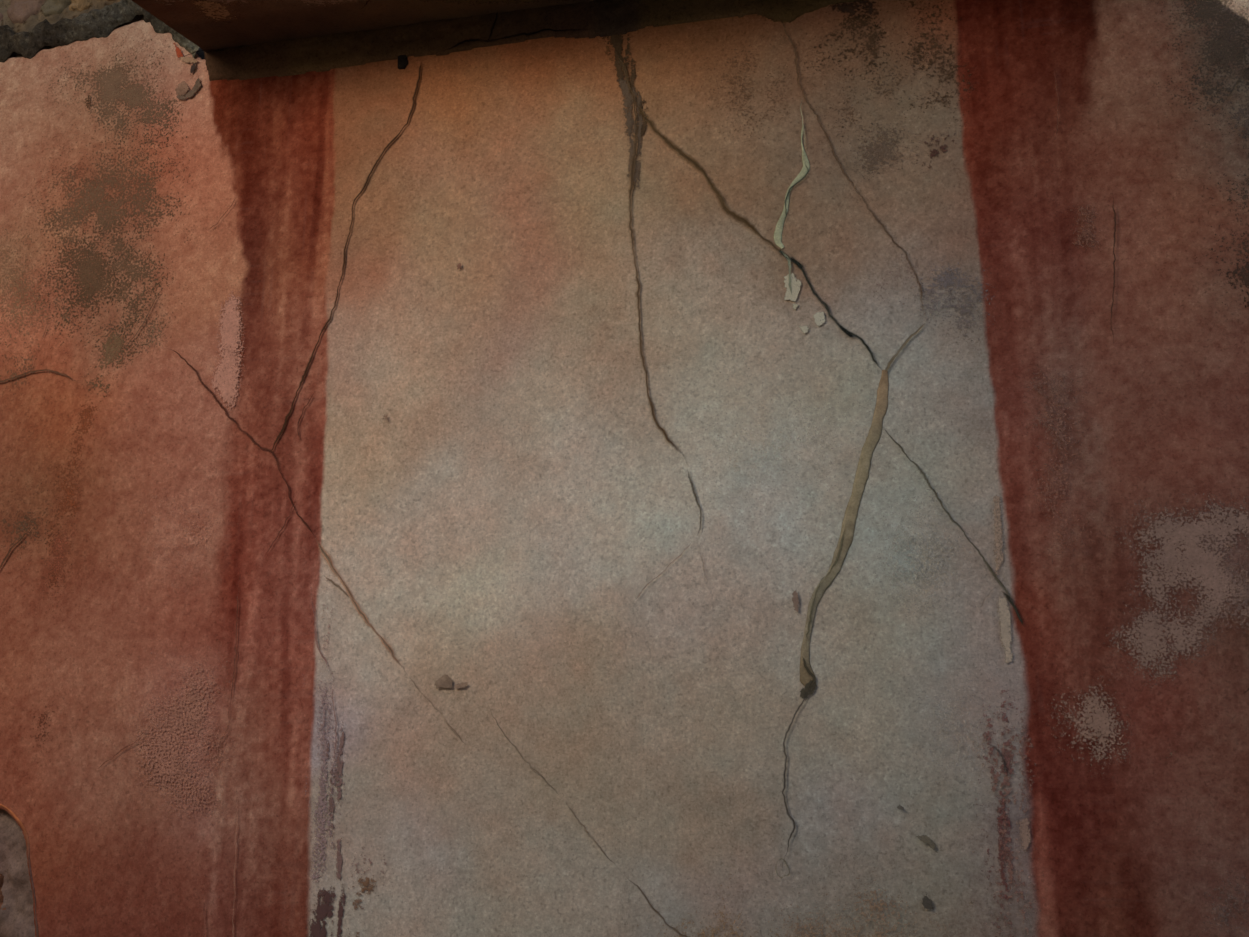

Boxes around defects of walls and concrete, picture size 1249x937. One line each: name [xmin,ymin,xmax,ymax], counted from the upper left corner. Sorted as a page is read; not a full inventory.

mould [1155,0,1249,154]
damp [0,39,191,397]
crack [175,65,421,686]
crack [618,22,924,596]
crack [887,433,1023,624]
spalling [0,804,39,937]
crack [495,719,610,860]
crack [633,883,687,937]
crack [775,693,806,878]